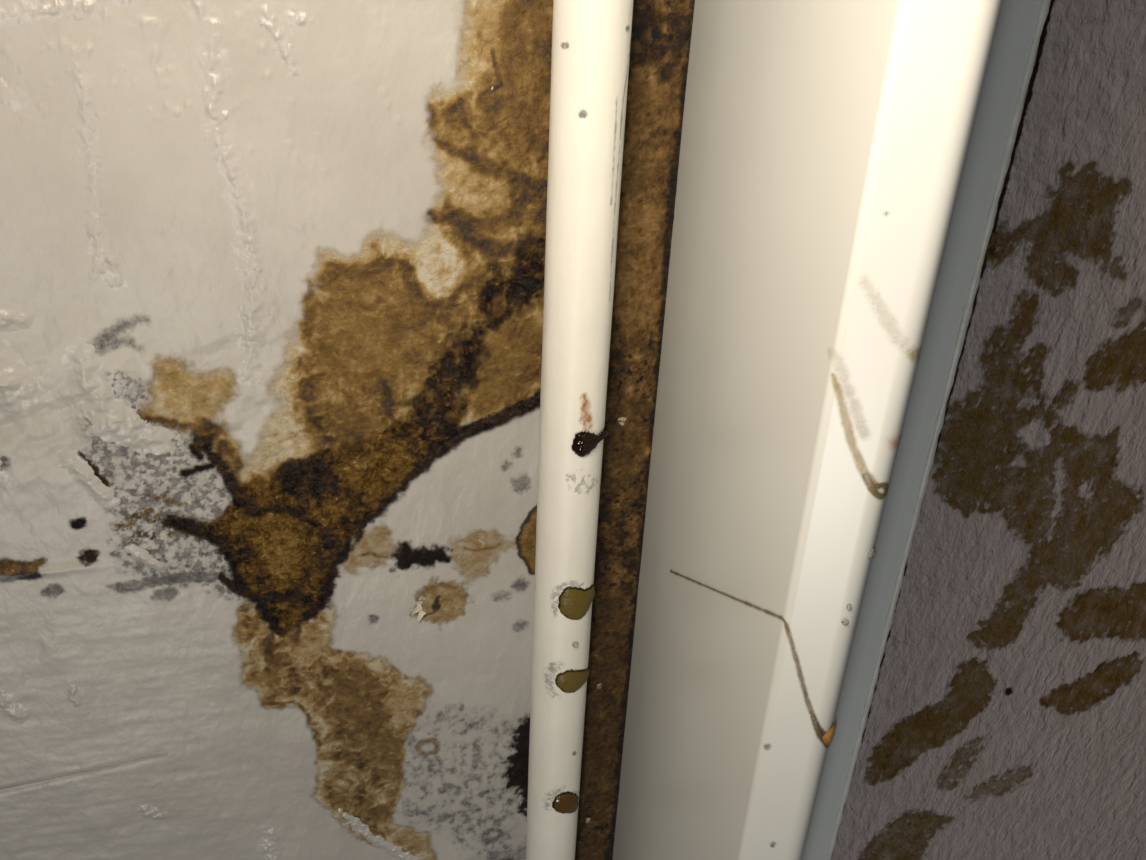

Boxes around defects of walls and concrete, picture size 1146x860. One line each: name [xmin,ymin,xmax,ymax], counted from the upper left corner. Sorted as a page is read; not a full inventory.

leakage [78,0,553,860]
crack [854,562,907,770]
leakage [860,811,953,860]
crack [934,0,1055,458]
leakage [966,767,1032,801]
leakage [865,162,1146,791]